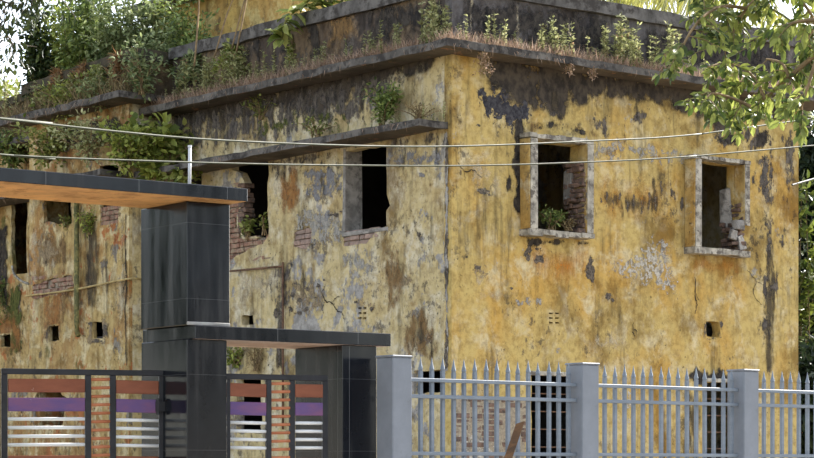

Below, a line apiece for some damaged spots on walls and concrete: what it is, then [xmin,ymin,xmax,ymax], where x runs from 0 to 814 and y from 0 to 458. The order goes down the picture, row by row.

water stain [368,0,442,44]
rust [278,166,300,210]
flaking render [294,163,381,281]
water stain [480,58,795,372]
flaking render [30,275,74,299]
water stain [385,250,402,308]
peeling [609,236,678,294]
water stain [405,309,436,358]